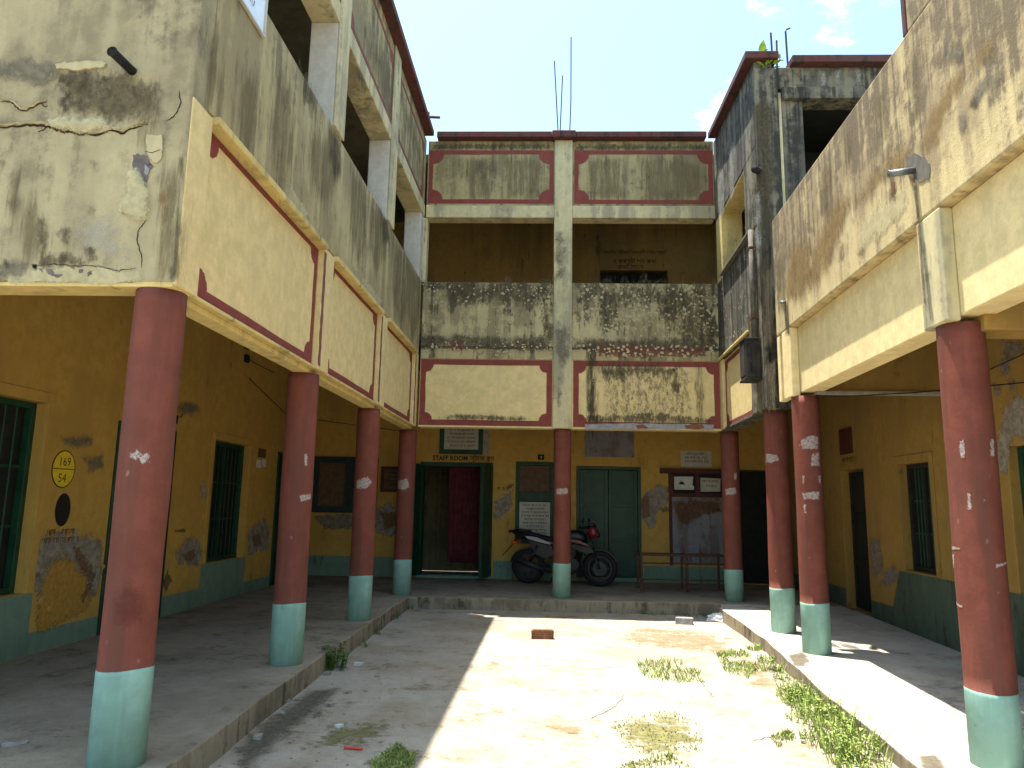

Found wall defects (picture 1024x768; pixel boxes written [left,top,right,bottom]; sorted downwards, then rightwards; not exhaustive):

damp [0,58,156,123]
crack [0,91,182,153]
damp [922,75,963,147]
damp [958,75,998,132]
peeling [132,134,163,186]
crack [38,220,146,272]
damp [312,130,719,424]
damp [748,103,911,345]
peeling [990,339,1024,475]
peeling [641,485,669,528]
peeling [34,526,105,632]
peeling [163,537,202,592]